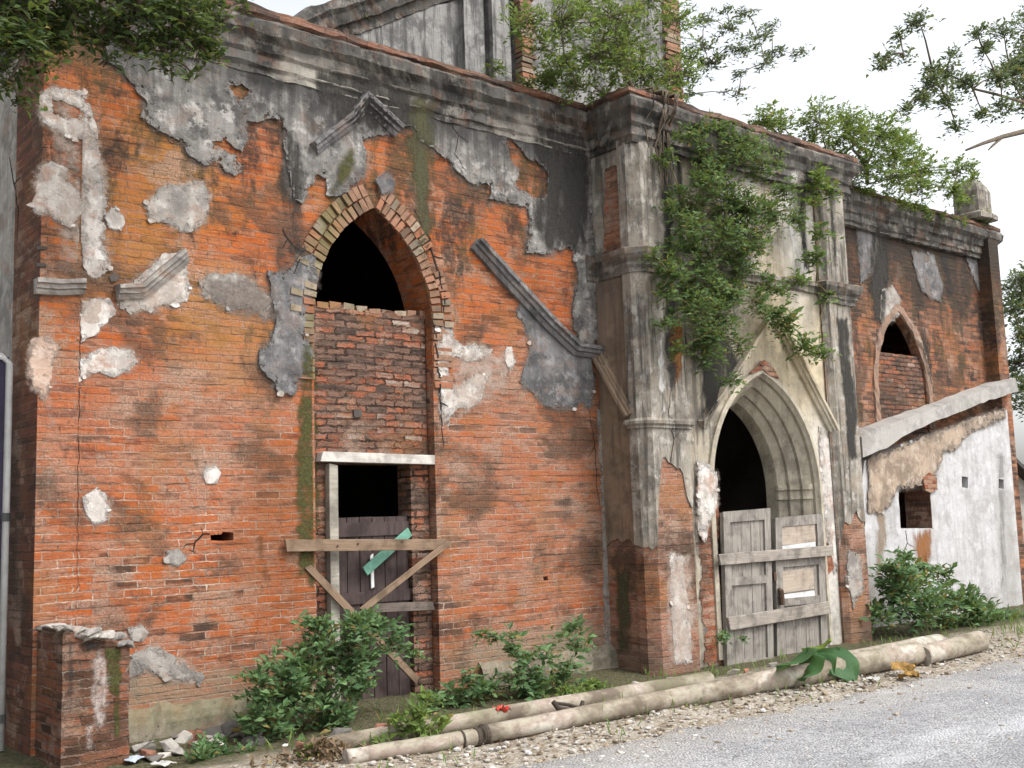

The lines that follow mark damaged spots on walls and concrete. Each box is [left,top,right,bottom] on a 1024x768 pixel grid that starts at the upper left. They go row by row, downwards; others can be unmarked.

flaking render [26,87,125,282]
flaking render [143,181,212,233]
flaking render [102,39,395,205]
leakage [279,69,435,256]
flaking render [402,111,598,344]
flaking render [28,335,61,405]
flaking render [127,623,149,642]
flaking render [79,264,270,382]
leakage [470,238,858,460]
spalling [668,461,724,666]
flaking render [818,426,864,610]
peeling [866,408,1006,515]